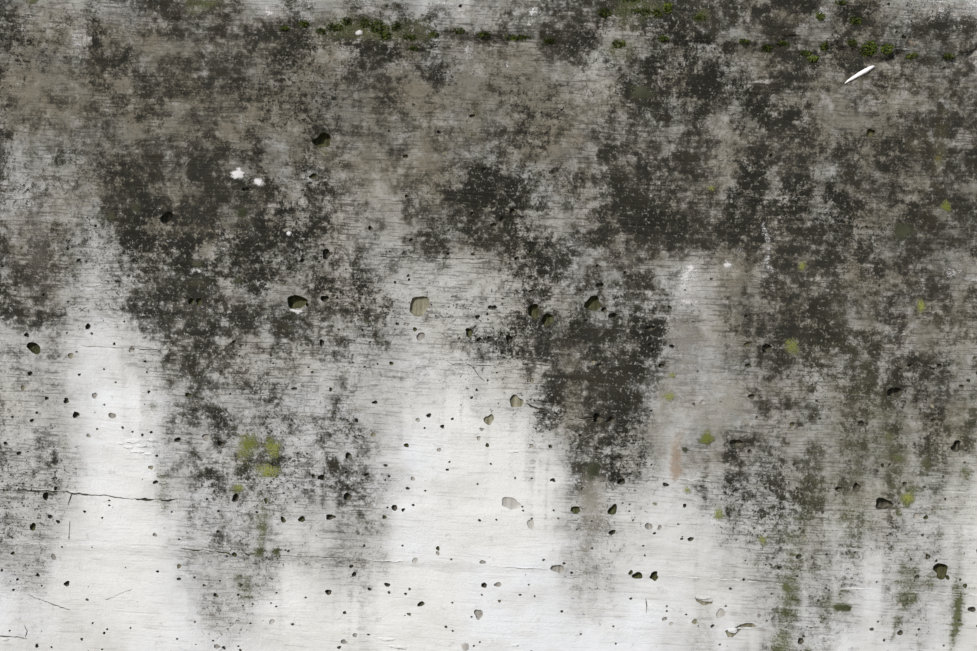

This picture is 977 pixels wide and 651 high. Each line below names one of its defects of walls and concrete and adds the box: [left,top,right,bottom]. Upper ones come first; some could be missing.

water stain [0,424,76,584]
crack [0,489,176,505]
water stain [188,496,286,599]
water stain [686,455,716,506]
water stain [714,420,834,580]
water stain [839,501,864,570]
spalling [725,623,756,637]
water stain [808,577,862,623]